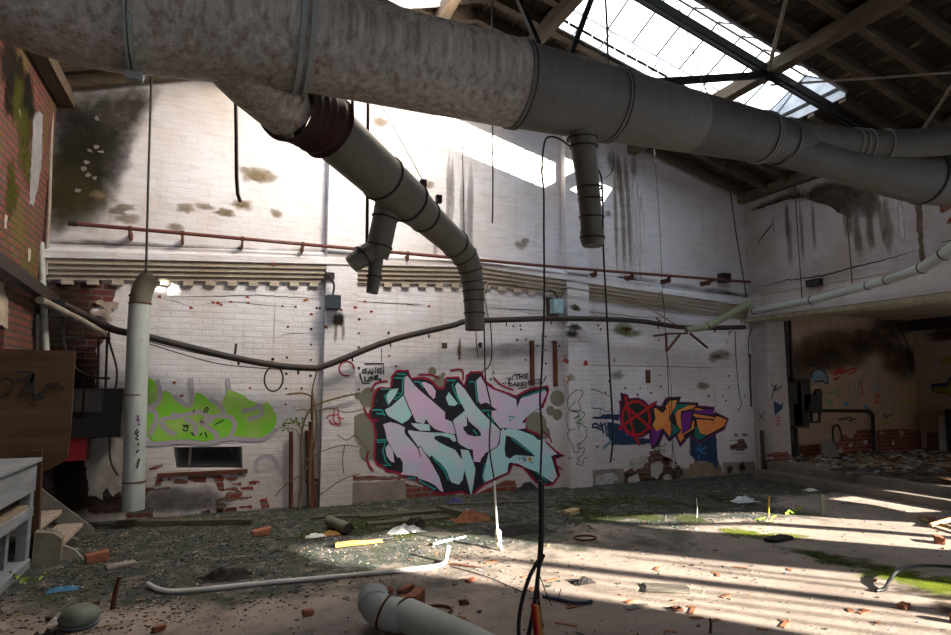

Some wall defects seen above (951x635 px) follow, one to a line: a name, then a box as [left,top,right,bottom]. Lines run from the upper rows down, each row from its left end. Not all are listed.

flaking render [29,111,43,205]
leakage [51,88,150,222]
leakage [242,168,274,182]
leakage [179,202,249,215]
leakage [607,156,644,264]
leakage [755,182,904,247]
flaking render [46,281,119,388]
leakage [789,319,916,378]
flaking render [75,427,269,518]
flaking render [624,450,724,480]
flaking render [765,444,821,469]
flaking render [835,428,939,453]